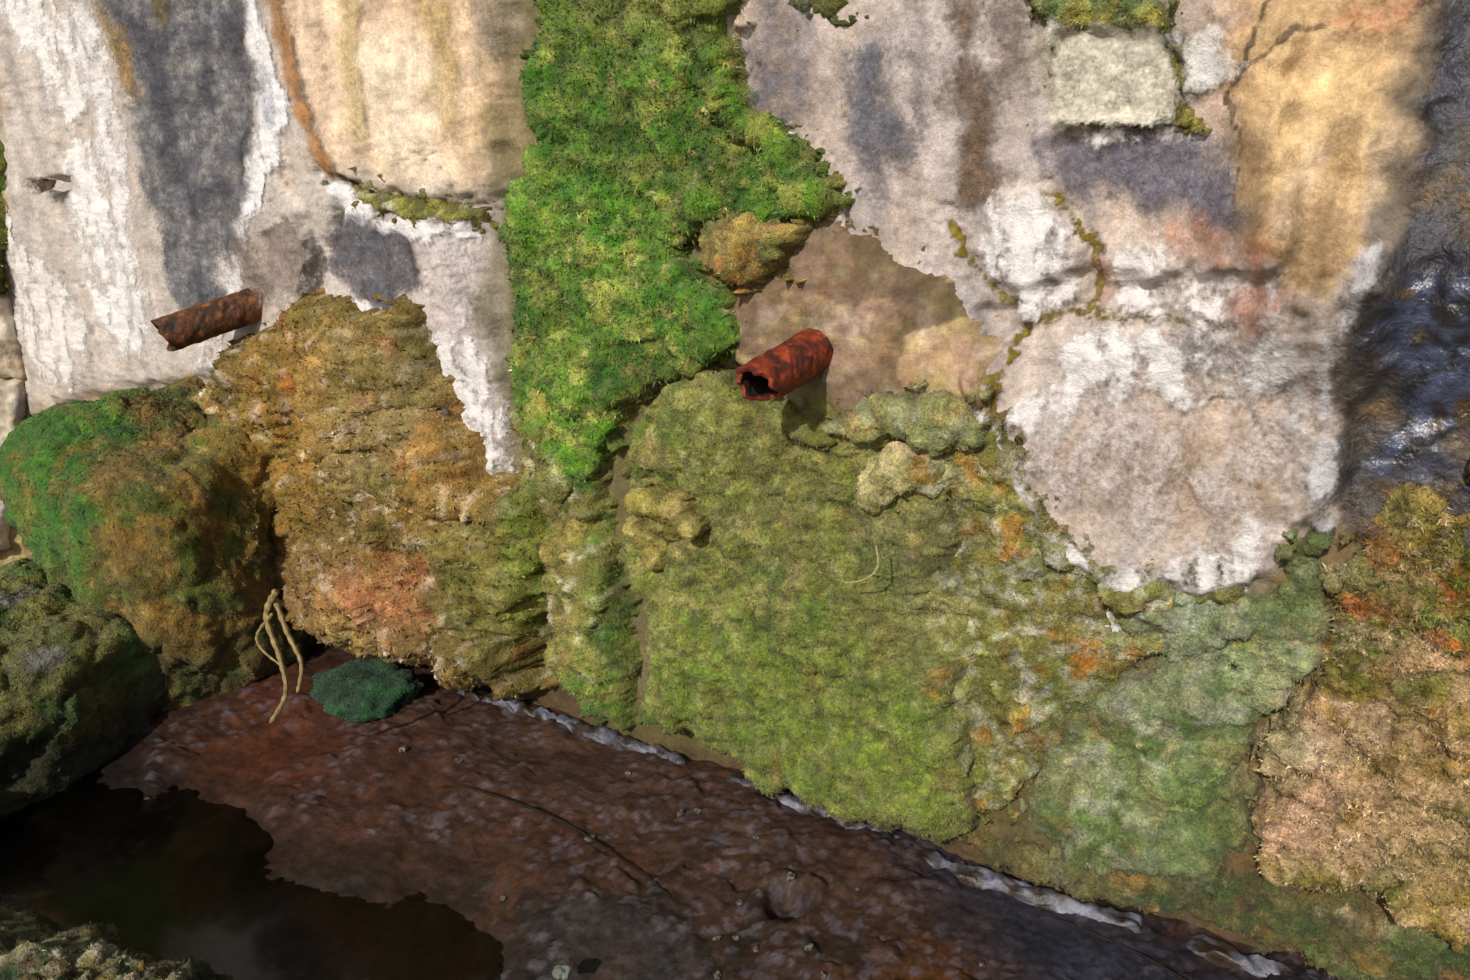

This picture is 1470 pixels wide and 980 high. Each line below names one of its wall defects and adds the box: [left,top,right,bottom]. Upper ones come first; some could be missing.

damp [839,0,1083,321]
damp [971,0,1470,597]